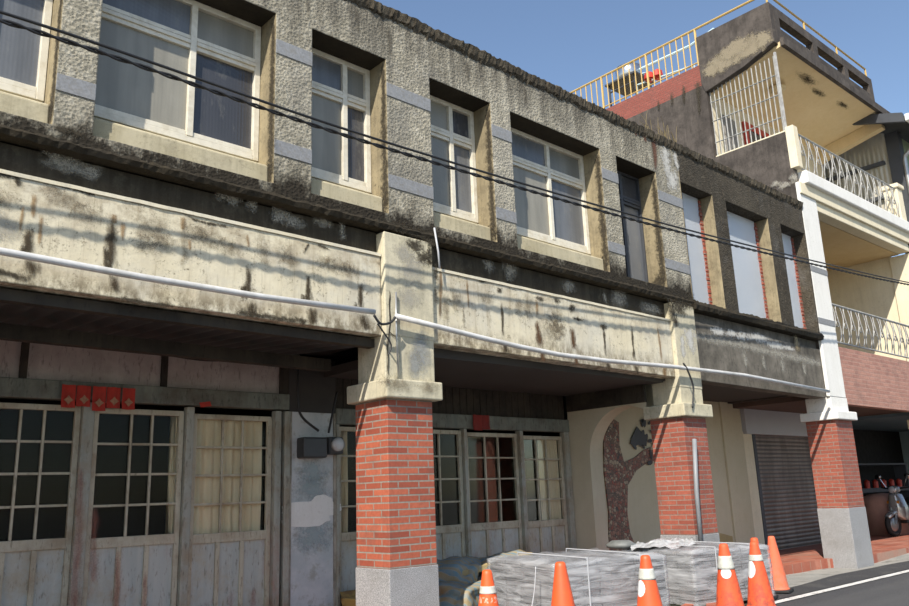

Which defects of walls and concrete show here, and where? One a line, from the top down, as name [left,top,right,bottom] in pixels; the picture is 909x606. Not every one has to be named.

leakage [0,229,41,281]
leakage [103,223,170,308]
leakage [237,268,317,325]
leakage [536,313,562,361]
leakage [667,292,820,374]
peeling [291,495,342,527]